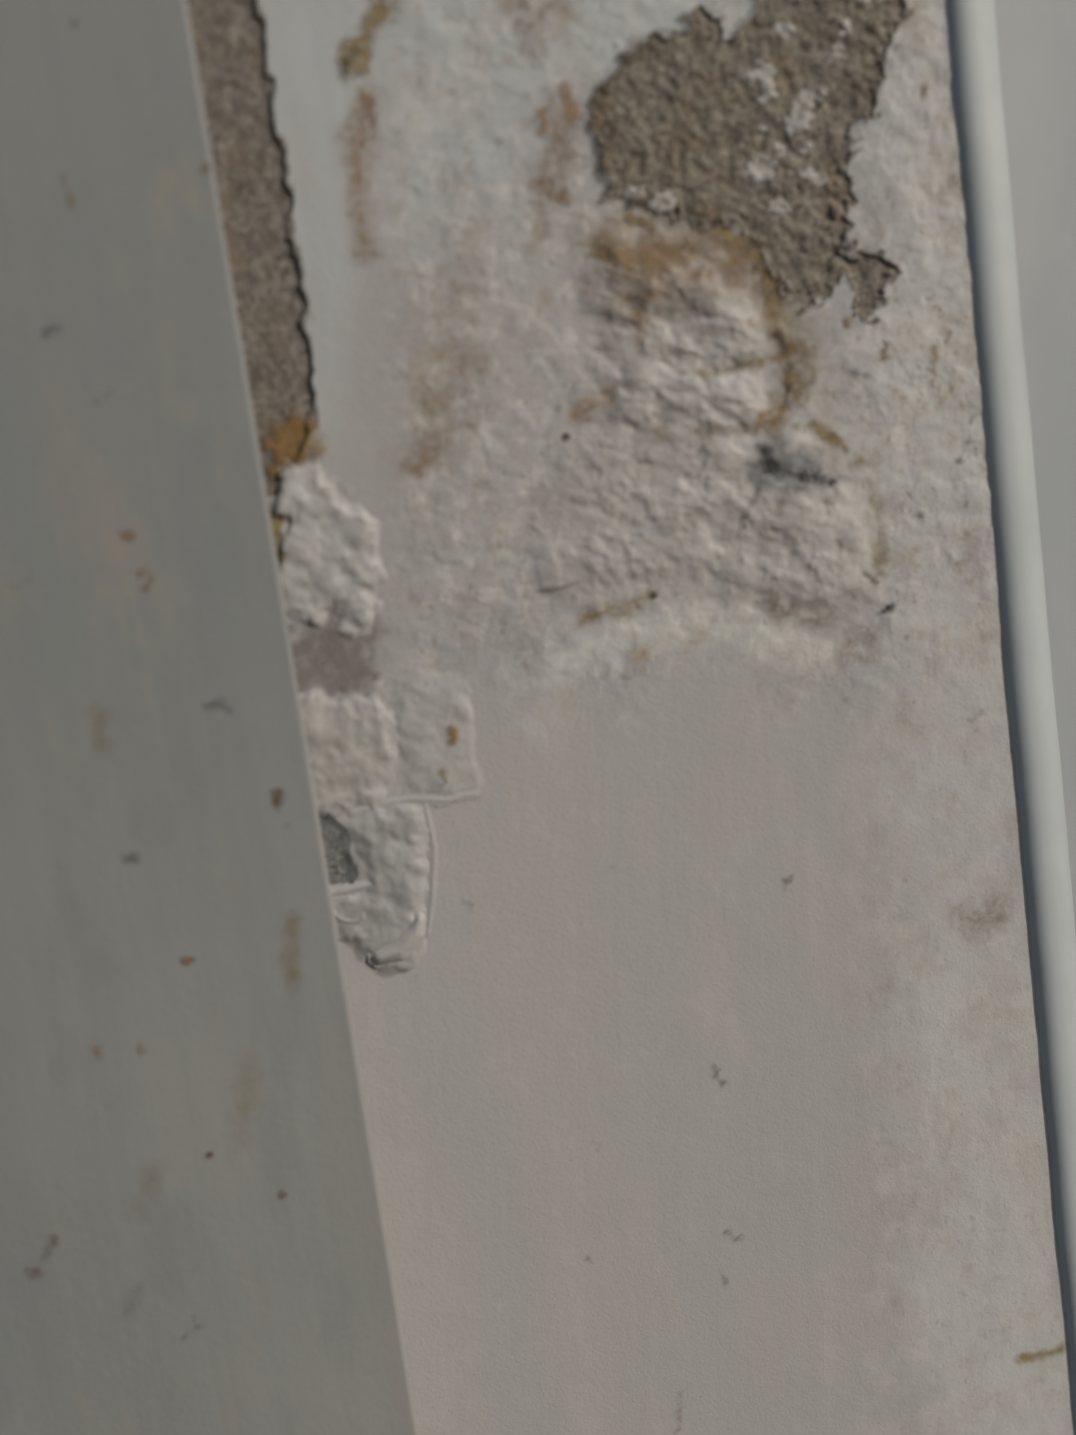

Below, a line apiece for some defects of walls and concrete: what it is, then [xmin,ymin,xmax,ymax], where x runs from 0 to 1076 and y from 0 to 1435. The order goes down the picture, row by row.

spalling [187,0,319,499]
rust [340,0,389,76]
damp [592,212,691,277]
spalling [583,0,913,328]